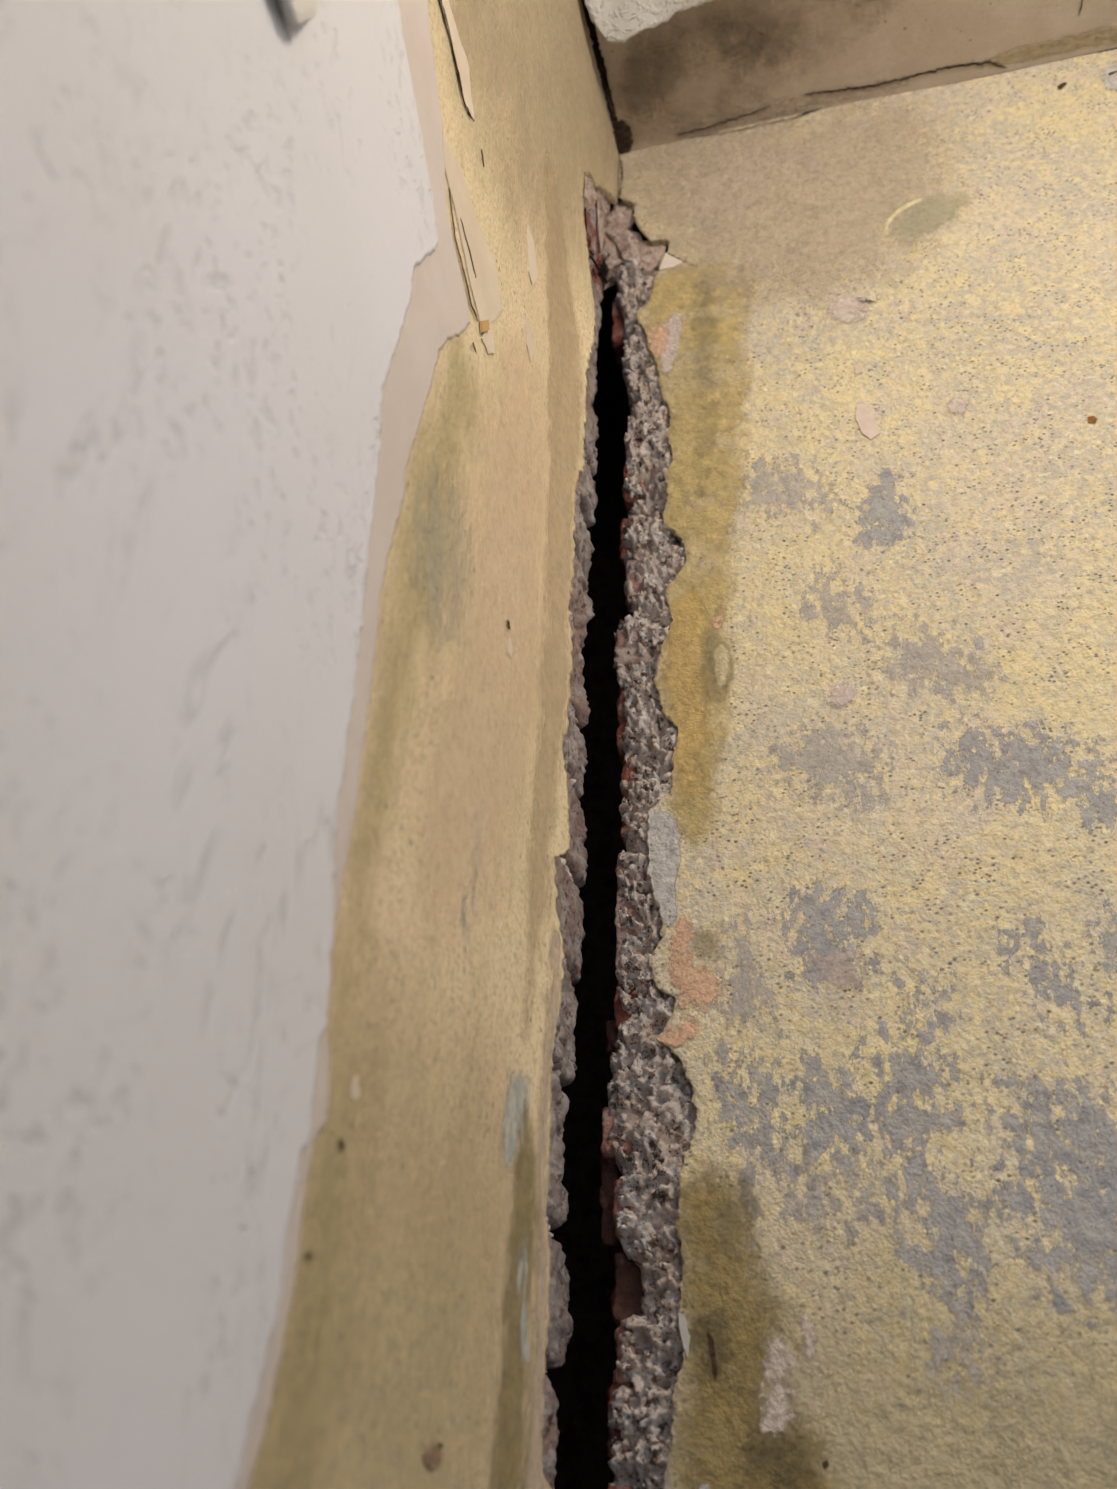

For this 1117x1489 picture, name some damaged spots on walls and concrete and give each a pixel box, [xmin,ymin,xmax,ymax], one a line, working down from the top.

crack [541,0,697,1489]
damp [619,19,942,842]
damp [677,1172,828,1489]